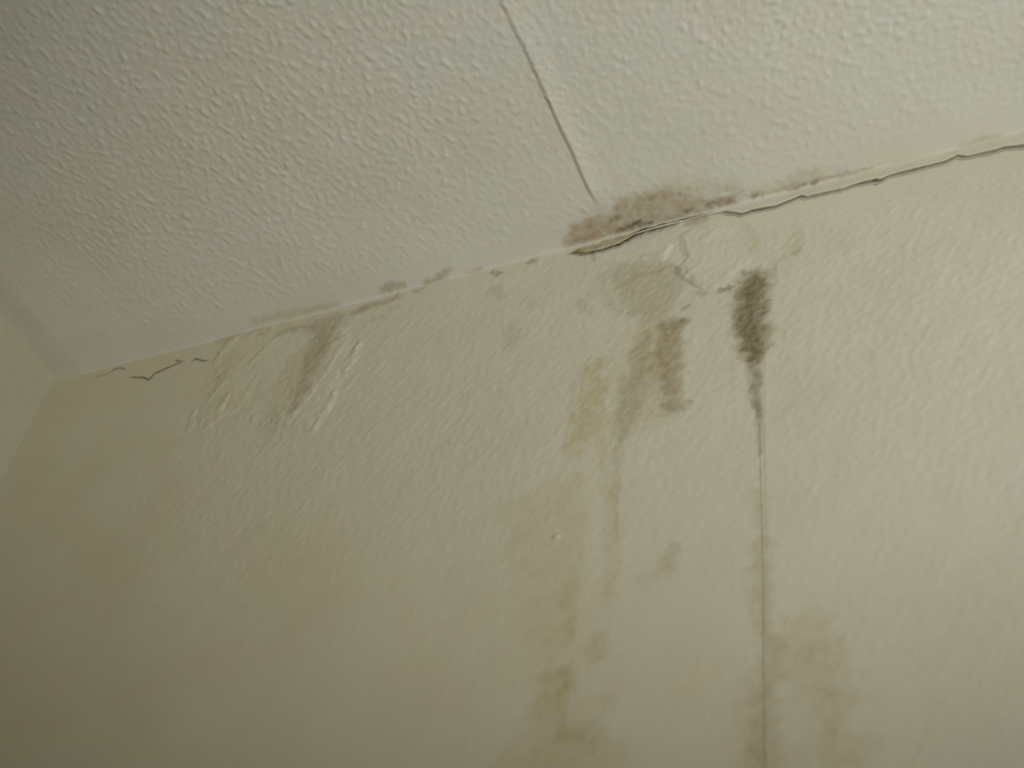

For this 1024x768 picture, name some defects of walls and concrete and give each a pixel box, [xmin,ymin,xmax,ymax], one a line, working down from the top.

crack [567,145,1024,256]
crack [95,357,209,381]
damp [213,264,544,445]
damp [474,220,810,768]